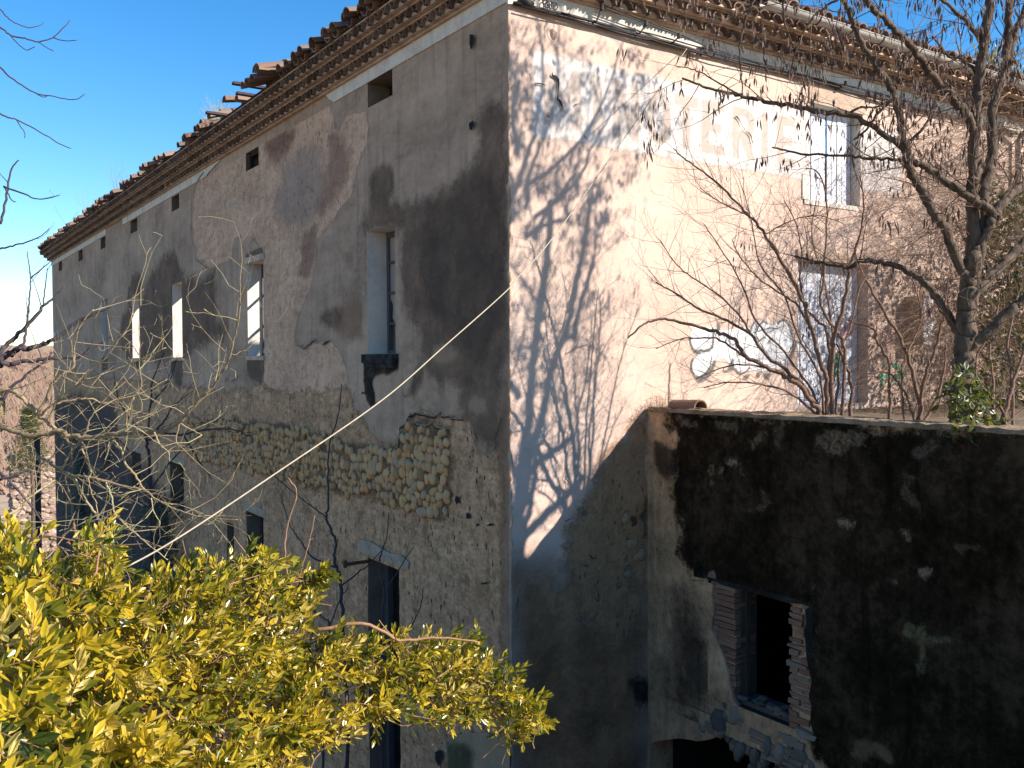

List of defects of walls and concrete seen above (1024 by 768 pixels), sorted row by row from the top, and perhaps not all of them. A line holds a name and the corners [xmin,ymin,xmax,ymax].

water stain [120,251,228,385]
spalling [56,106,506,768]
water stain [362,104,509,448]
water stain [654,412,1024,768]